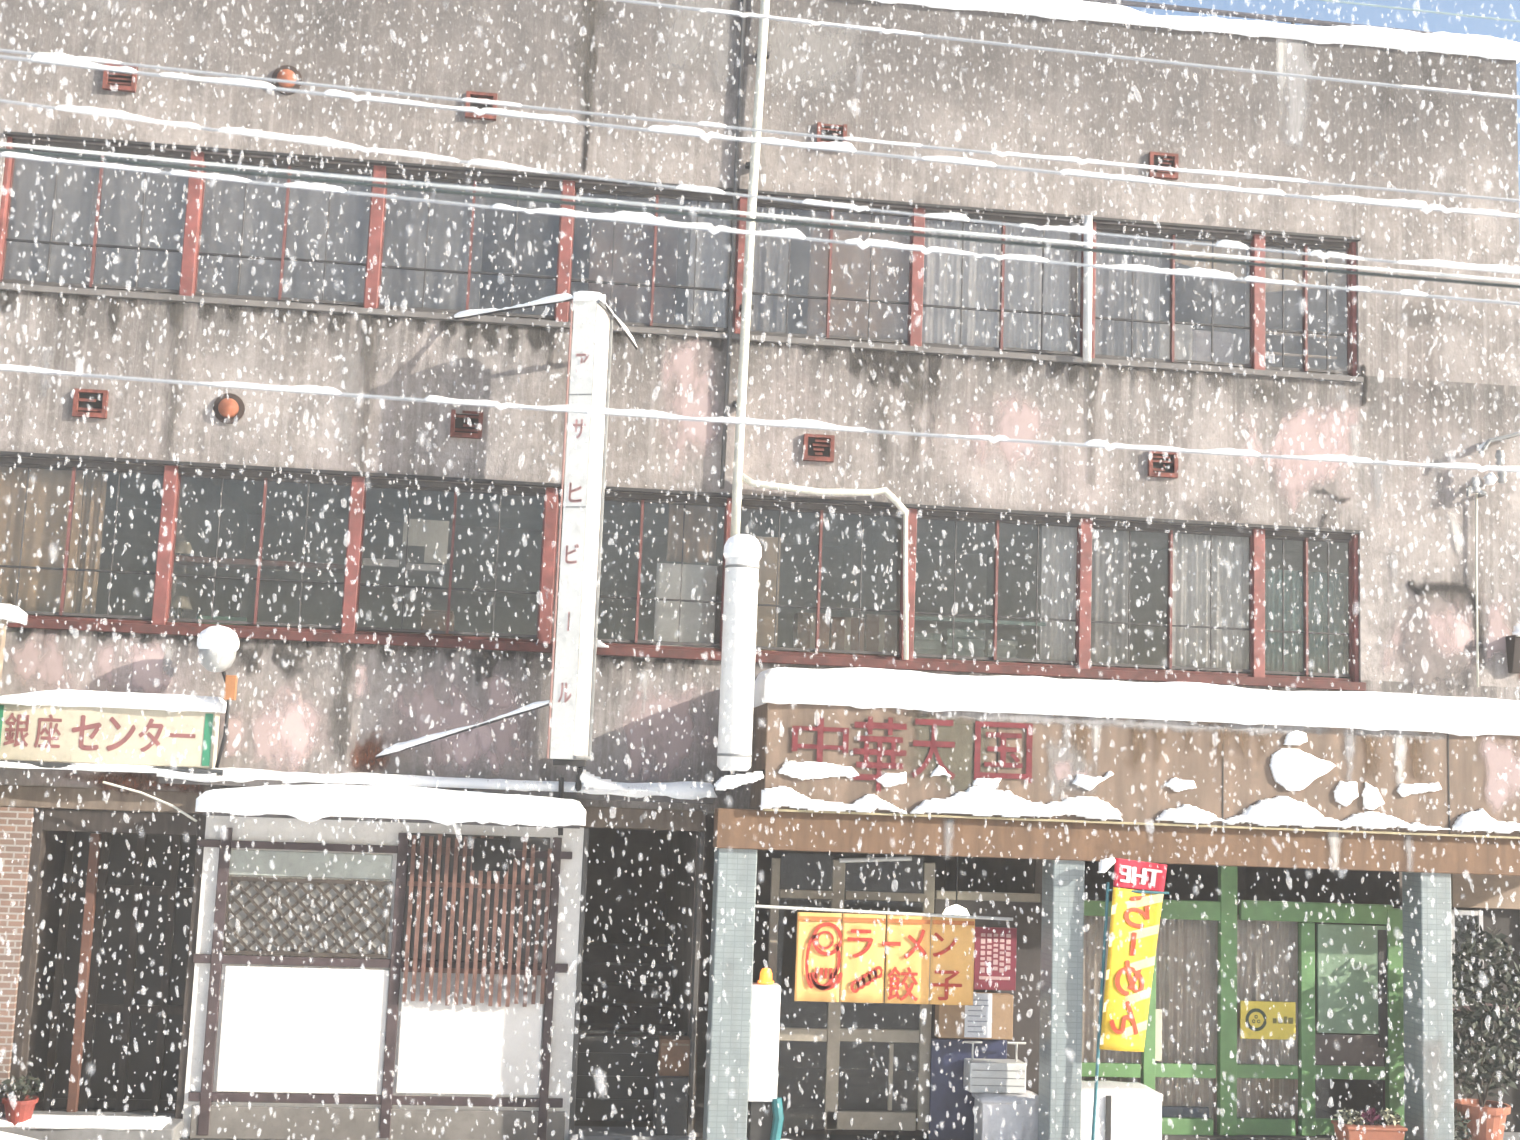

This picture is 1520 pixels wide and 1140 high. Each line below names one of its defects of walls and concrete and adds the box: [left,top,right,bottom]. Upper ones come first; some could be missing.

damp [1277,38,1313,146]